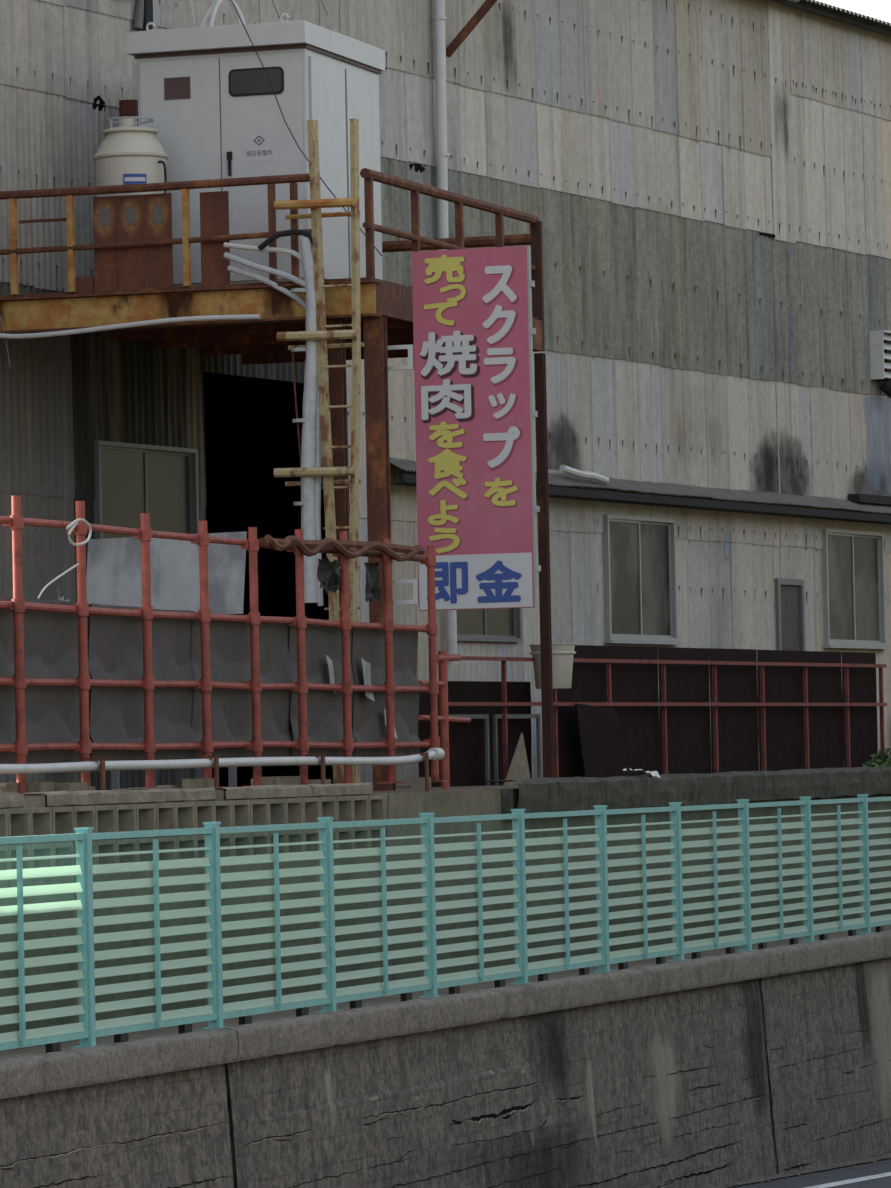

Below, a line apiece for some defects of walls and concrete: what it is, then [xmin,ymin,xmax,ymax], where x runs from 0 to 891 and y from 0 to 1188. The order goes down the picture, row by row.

rust [162,293,193,317]
rust [267,288,294,313]
spalling [449,1095,584,1127]